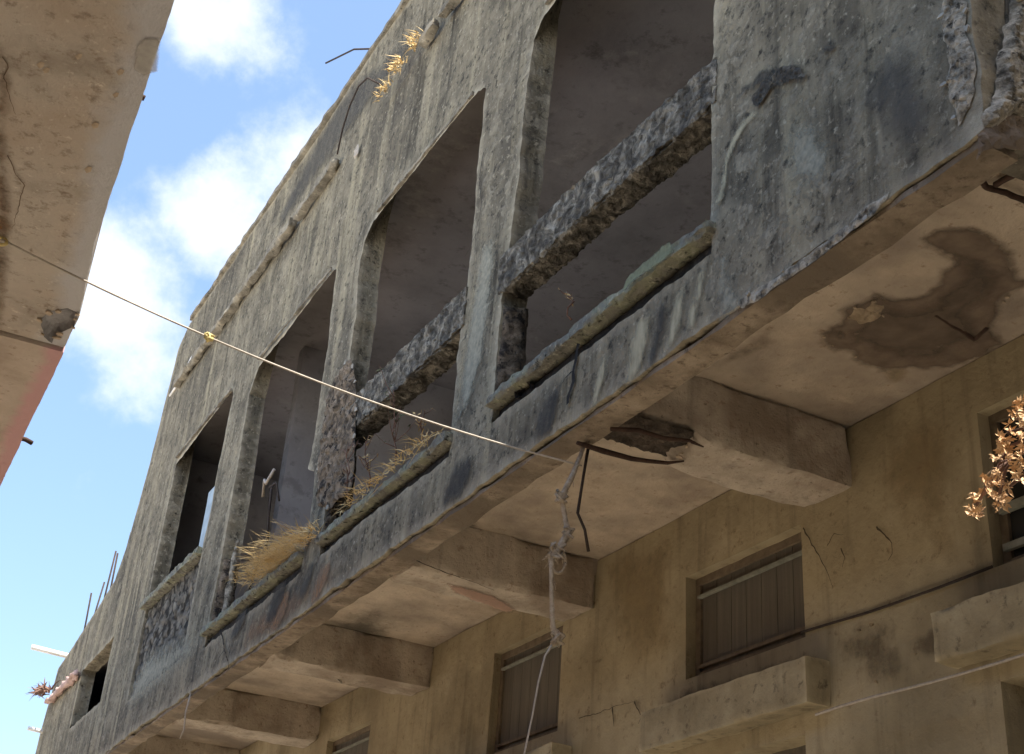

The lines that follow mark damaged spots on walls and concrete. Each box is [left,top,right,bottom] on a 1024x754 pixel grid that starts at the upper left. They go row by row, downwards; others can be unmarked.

spalling [937,0,976,126]
spalling [37,308,80,343]
spalling [576,415,704,465]
crack [803,527,845,587]
crack [579,701,641,724]